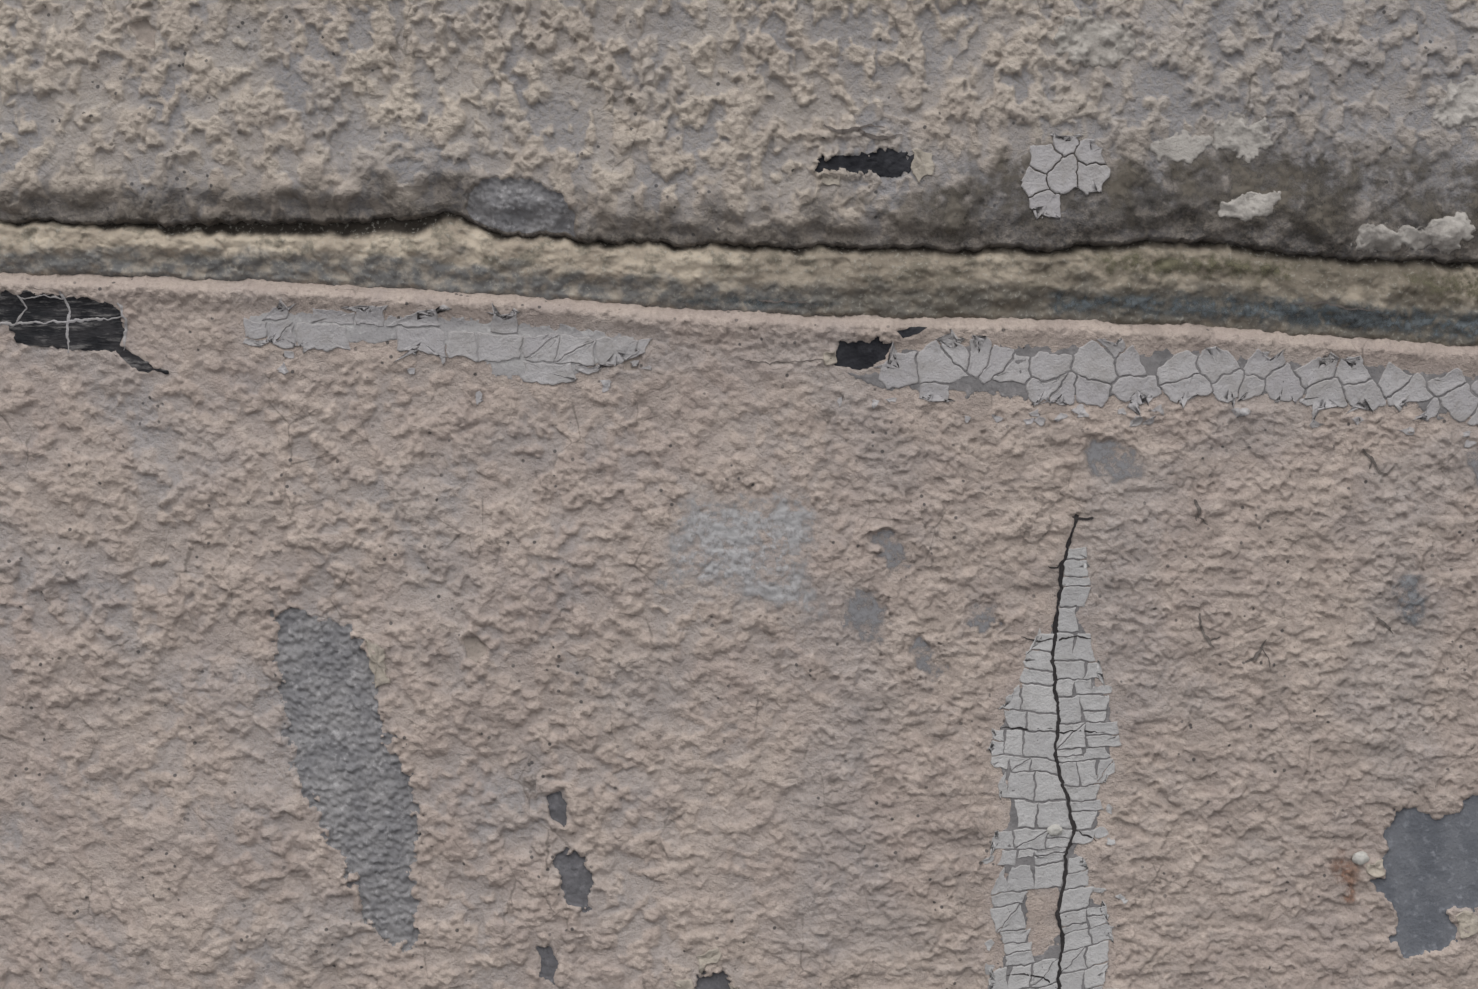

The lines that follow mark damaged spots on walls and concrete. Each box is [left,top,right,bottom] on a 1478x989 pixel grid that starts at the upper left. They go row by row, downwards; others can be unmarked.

peeling [815,148,935,186]
peeling [1021,132,1110,220]
damp [882,149,1478,241]
peeling [1350,212,1476,257]
peeling [0,290,169,374]
peeling [243,299,652,393]
damp [1054,292,1478,338]
peeling [823,324,1478,484]
peeling [270,607,424,953]
crack [1000,514,1104,989]
peeling [982,547,1128,989]
peeling [1366,795,1478,958]